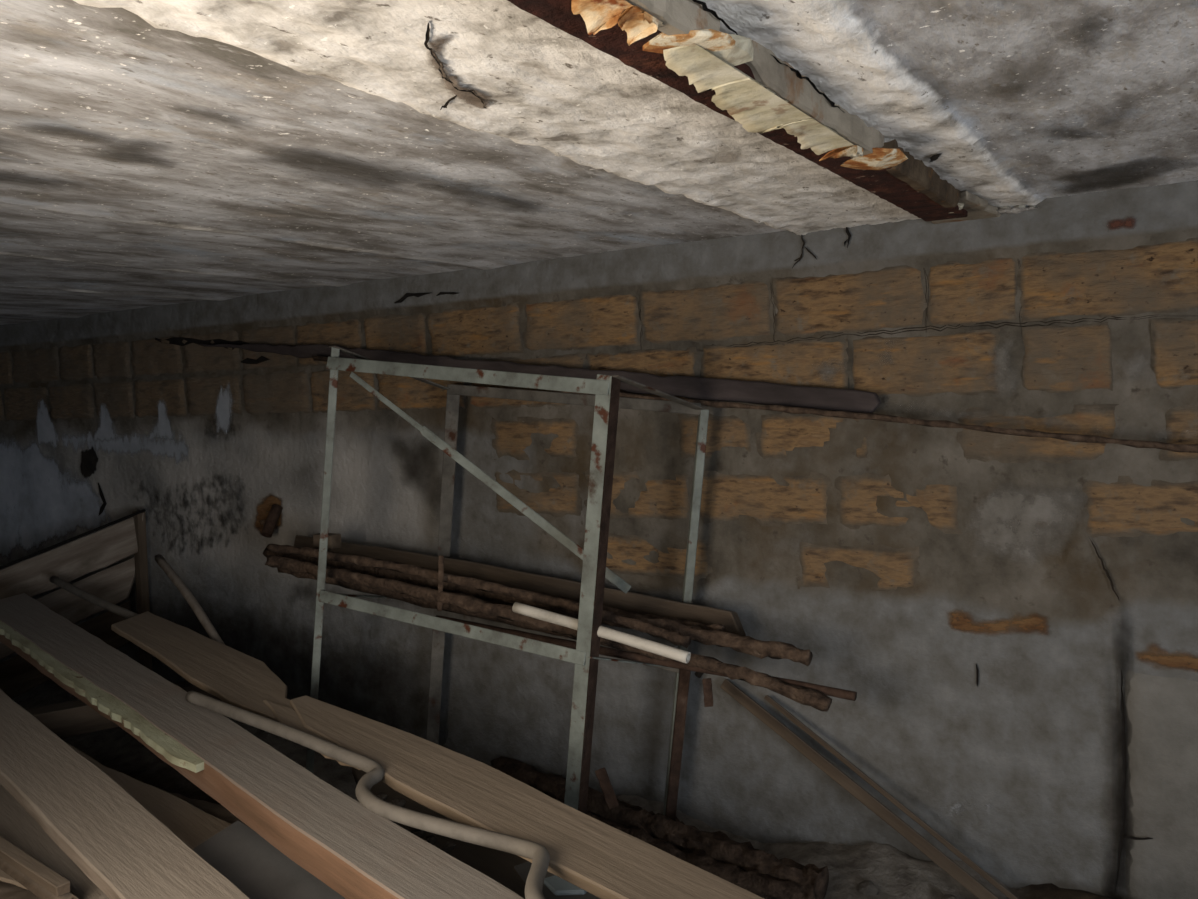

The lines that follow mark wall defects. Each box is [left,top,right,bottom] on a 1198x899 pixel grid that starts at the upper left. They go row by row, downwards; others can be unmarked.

crack [424,23,490,110]
peeling [571,0,665,46]
peeling [663,43,863,161]
crack [843,227,851,248]
crack [711,235,1198,347]
crack [1090,539,1120,601]
crack [1108,641,1153,895]